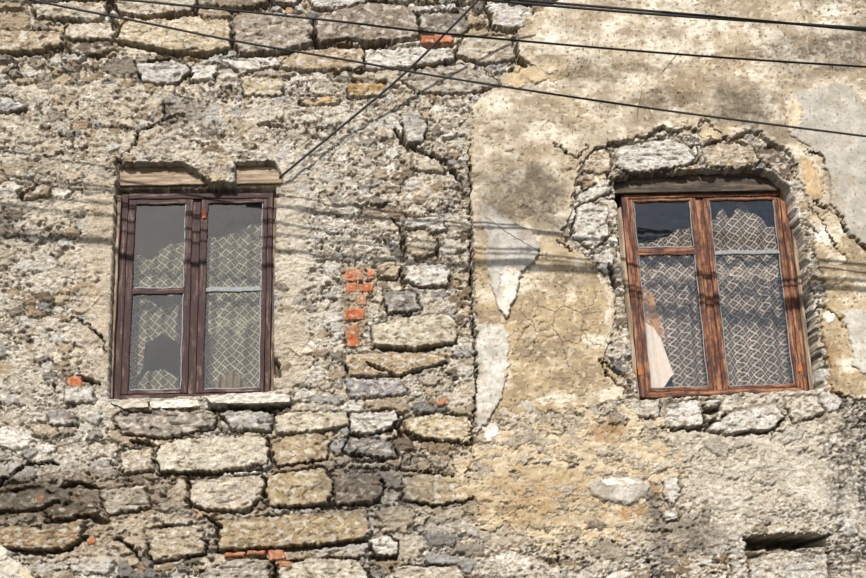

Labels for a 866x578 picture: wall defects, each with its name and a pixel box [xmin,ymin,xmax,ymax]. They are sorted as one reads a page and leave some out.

flaking render [500,60,568,92]
crack [414,148,441,164]
flaking render [564,81,866,403]
crack [455,149,572,451]
crack [517,282,622,387]